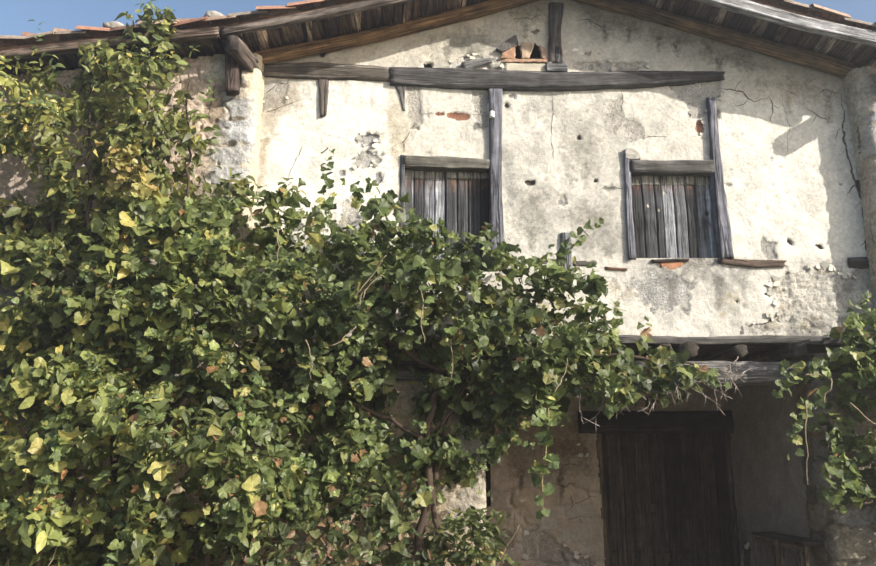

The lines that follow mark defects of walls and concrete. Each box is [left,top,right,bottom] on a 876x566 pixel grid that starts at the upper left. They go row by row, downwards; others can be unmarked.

spalling [338,130,385,184]
crack [726,80,876,251]
spalling [760,236,792,260]
peeling [807,261,857,279]